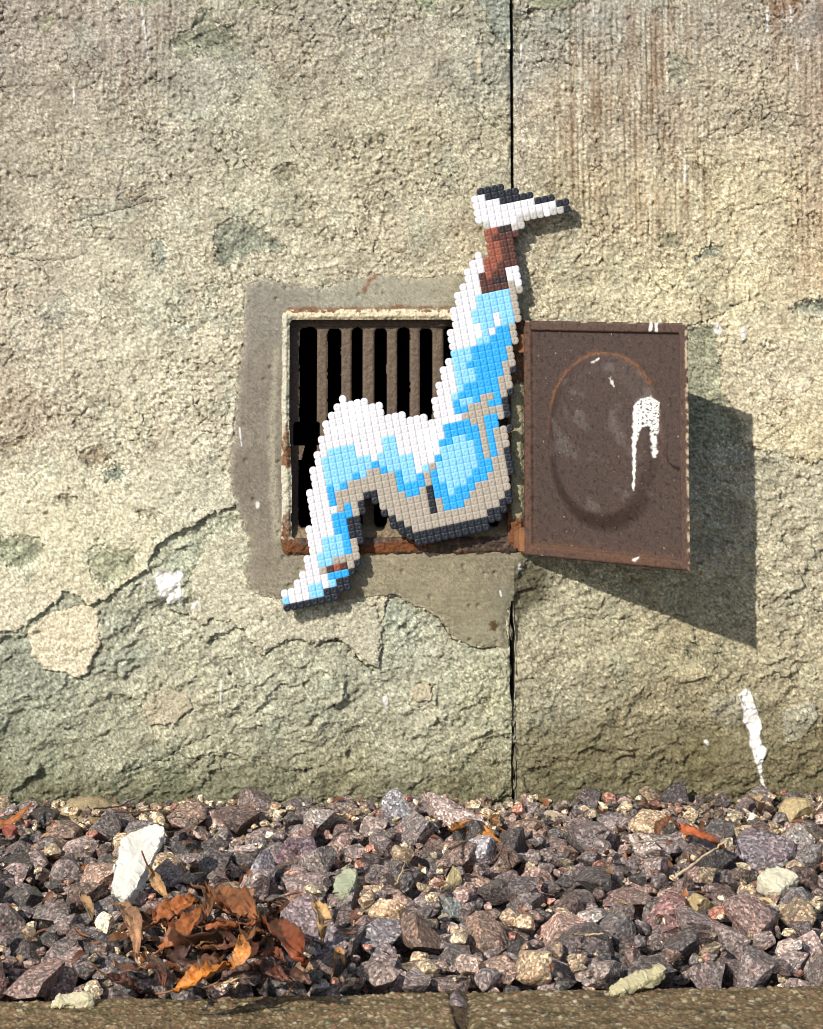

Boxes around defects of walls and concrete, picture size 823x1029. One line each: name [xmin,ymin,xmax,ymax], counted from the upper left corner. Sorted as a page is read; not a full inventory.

rust [282,512,310,555]
rust [358,541,429,554]
spalling [0,320,823,815]